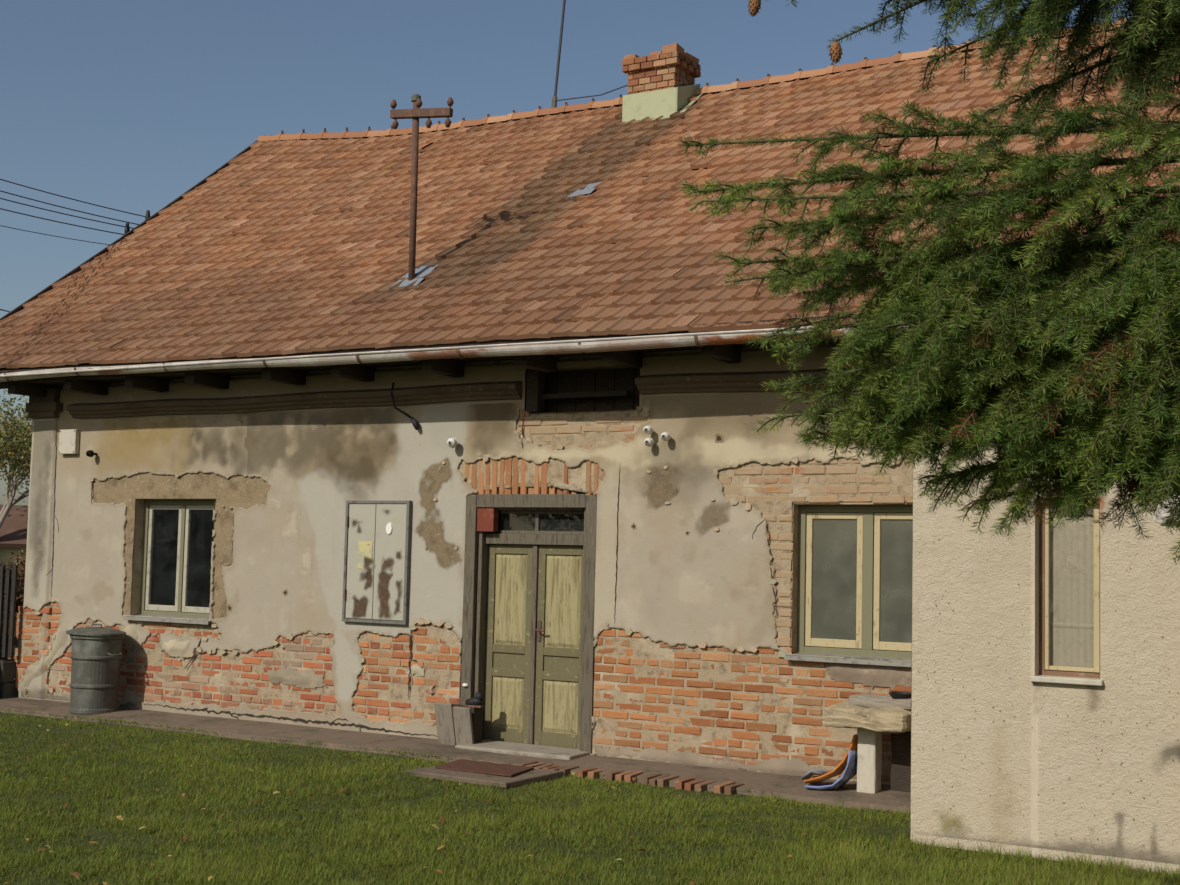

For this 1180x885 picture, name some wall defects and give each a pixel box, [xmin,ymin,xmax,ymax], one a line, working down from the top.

spalling [417,406,650,567]
flaking render [2,602,72,697]
flaking render [75,617,462,725]
flaking render [592,437,913,783]
crack [752,519,777,614]